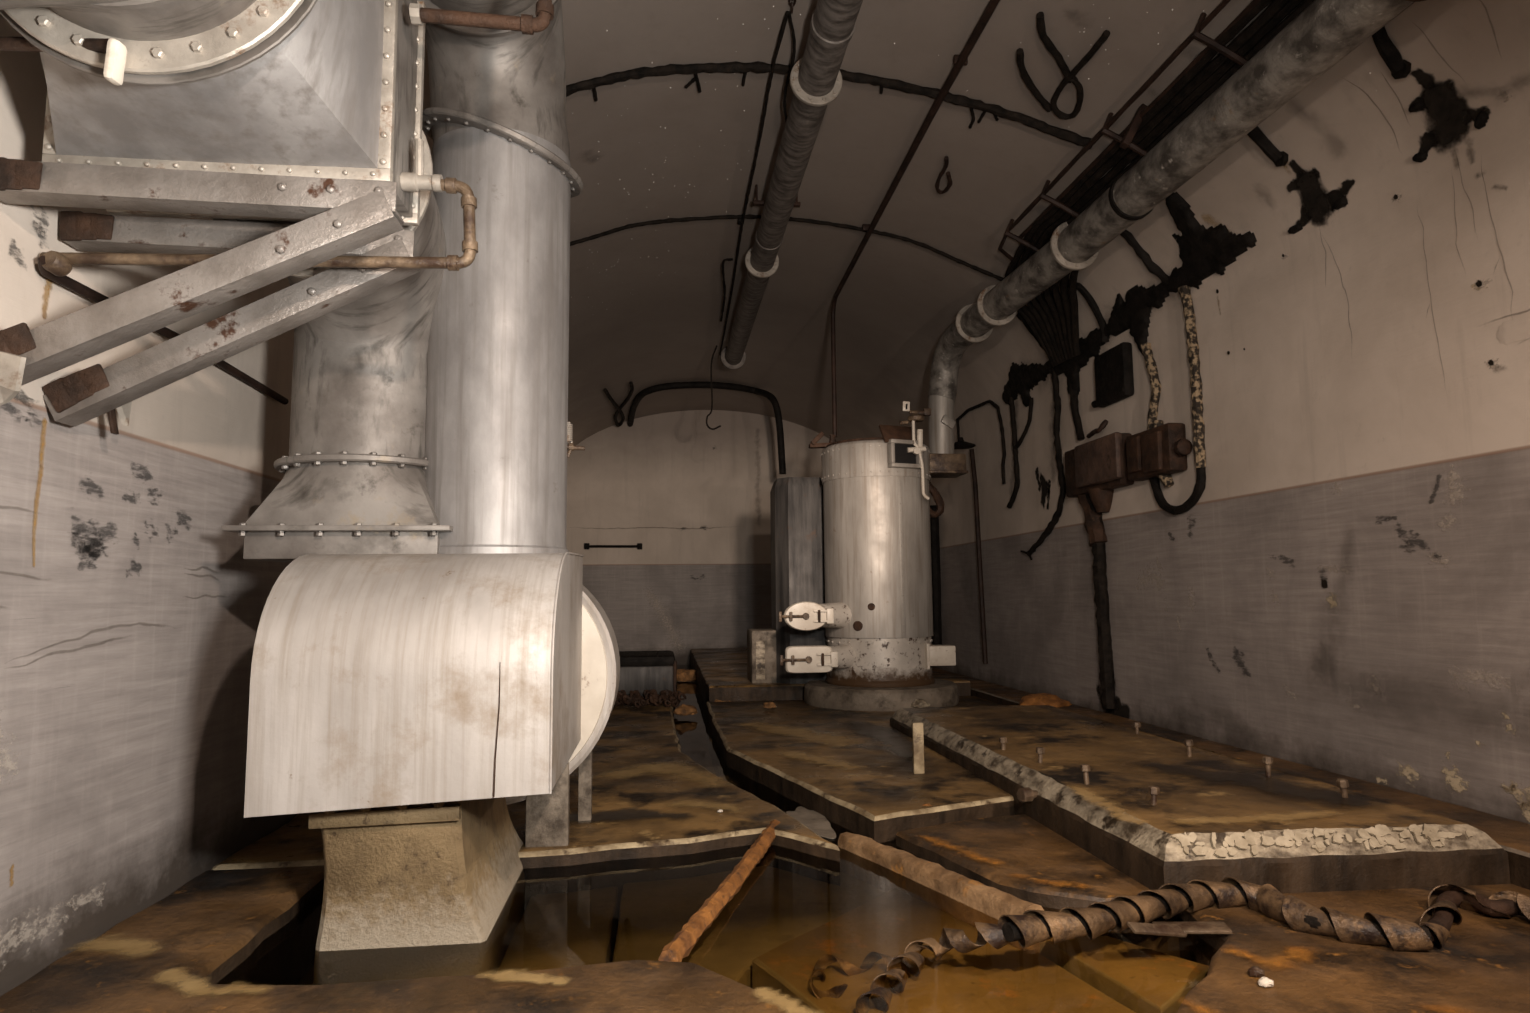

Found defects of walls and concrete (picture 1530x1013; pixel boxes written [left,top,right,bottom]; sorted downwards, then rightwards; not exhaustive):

rust [33,419,46,566]
peeling [122,464,162,505]
peeling [72,516,116,569]
peeling [126,512,191,576]
peeling [1376,516,1441,558]
peeling [1441,751,1470,793]
peeling [1171,823,1473,858]